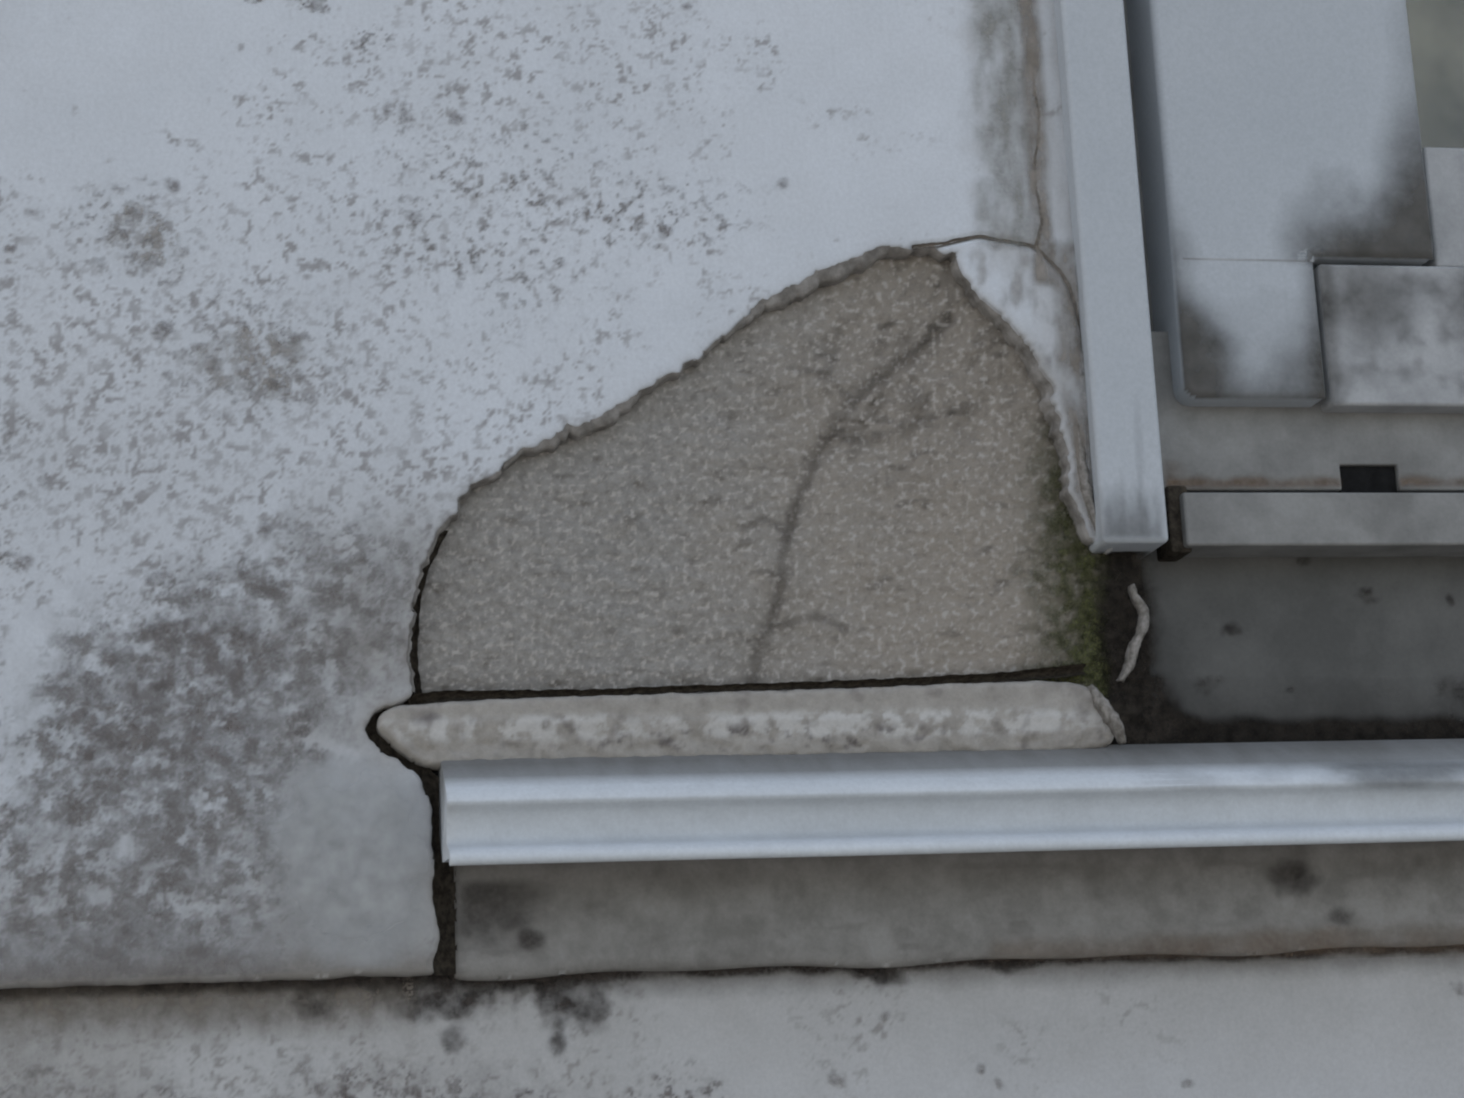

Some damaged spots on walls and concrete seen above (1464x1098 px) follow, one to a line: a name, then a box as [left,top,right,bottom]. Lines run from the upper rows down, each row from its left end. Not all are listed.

damp [981,0,1082,377]
crack [365,530,1087,975]
spalling [407,245,1126,745]
damp [1068,406,1094,524]
spalling [1116,584,1150,683]